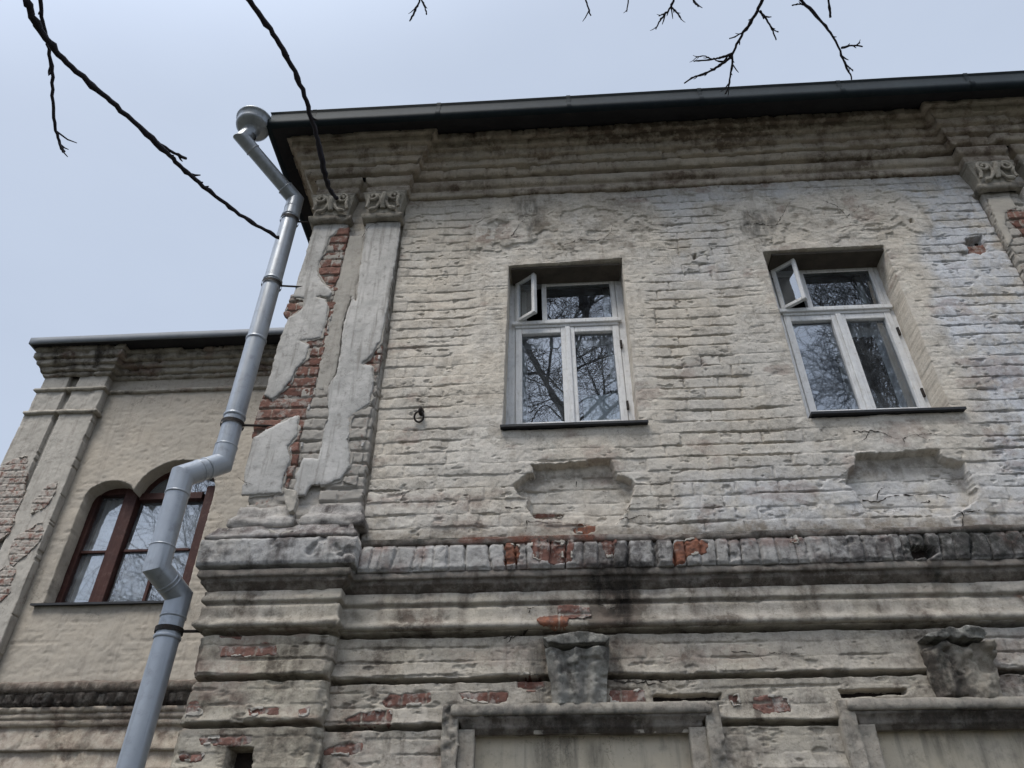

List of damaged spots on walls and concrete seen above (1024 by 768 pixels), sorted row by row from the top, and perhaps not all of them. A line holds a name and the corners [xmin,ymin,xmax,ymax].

flaking render [993,206,1024,265]
flaking render [252,227,350,515]
crack [853,430,937,444]
crack [862,488,982,526]
spalling [0,456,58,602]
spalling [504,523,617,566]
spalling [672,537,708,567]
spalling [537,605,592,631]
spalling [345,693,431,731]
spalling [459,672,545,704]
spalling [609,688,791,714]
spalling [323,742,363,756]